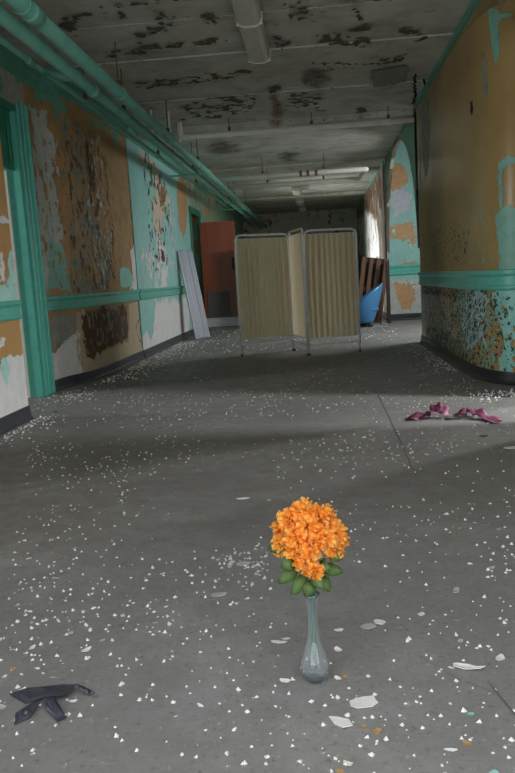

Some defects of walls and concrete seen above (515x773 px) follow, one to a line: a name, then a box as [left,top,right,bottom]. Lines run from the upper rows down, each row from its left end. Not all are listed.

peeling [481,8,513,103]
peeling [0,250,17,302]
peeling [29,90,190,380]
peeling [358,109,421,258]
peeling [495,156,515,270]
peeling [390,279,515,372]
peeling [0,354,28,418]